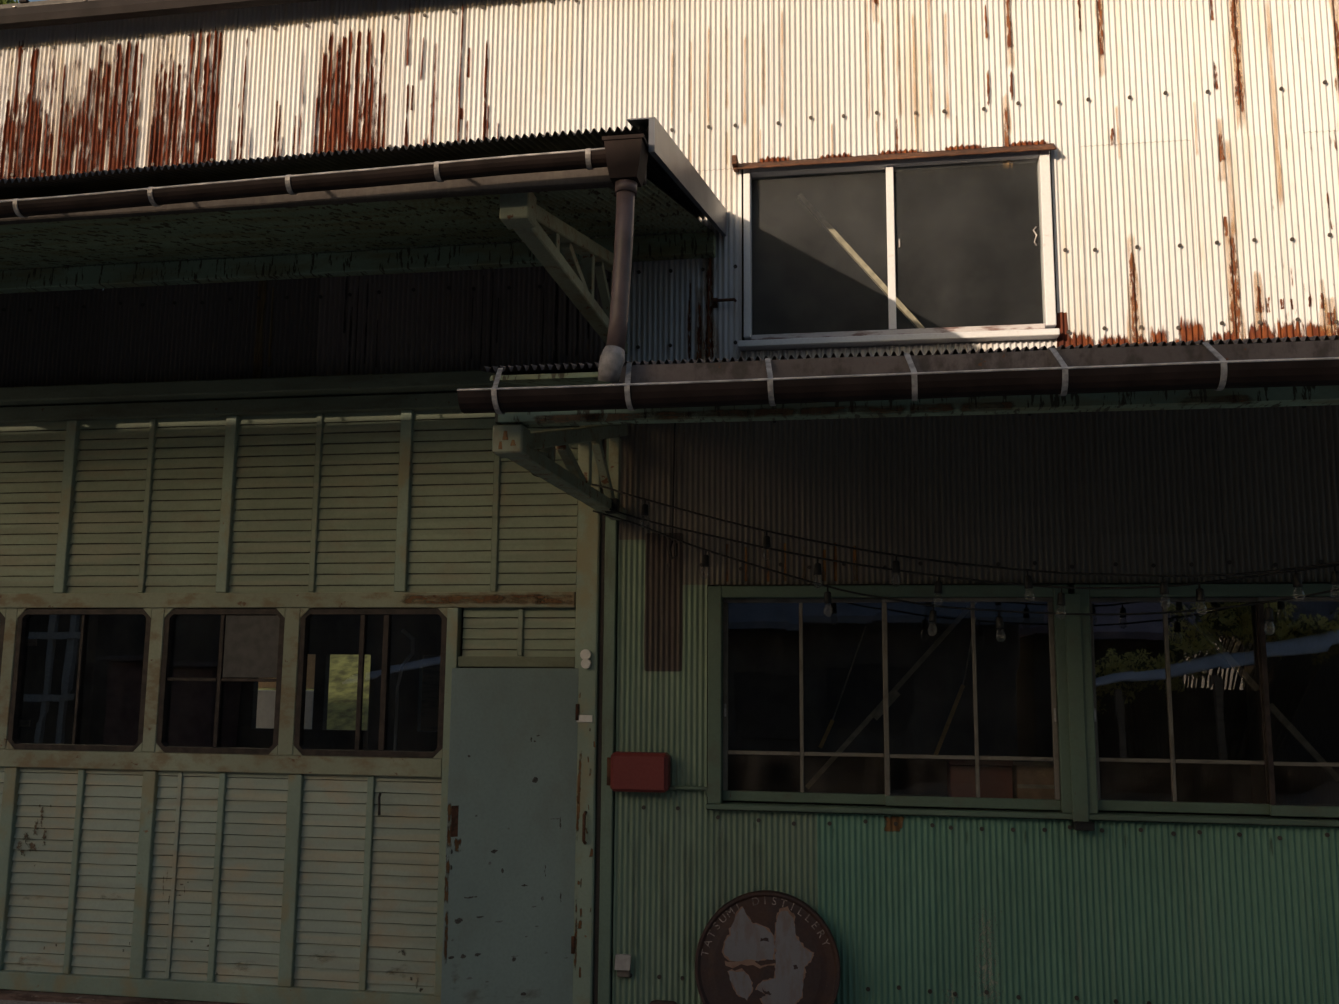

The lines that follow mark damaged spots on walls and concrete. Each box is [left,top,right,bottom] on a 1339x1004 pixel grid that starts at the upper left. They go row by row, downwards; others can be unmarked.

corrosion [0,27,250,180]
corrosion [272,28,386,158]
corrosion [404,9,437,147]
corrosion [457,3,498,142]
corrosion [1218,135,1226,162]
corrosion [1230,0,1245,112]
corrosion [687,258,714,361]
corrosion [1057,216,1339,347]